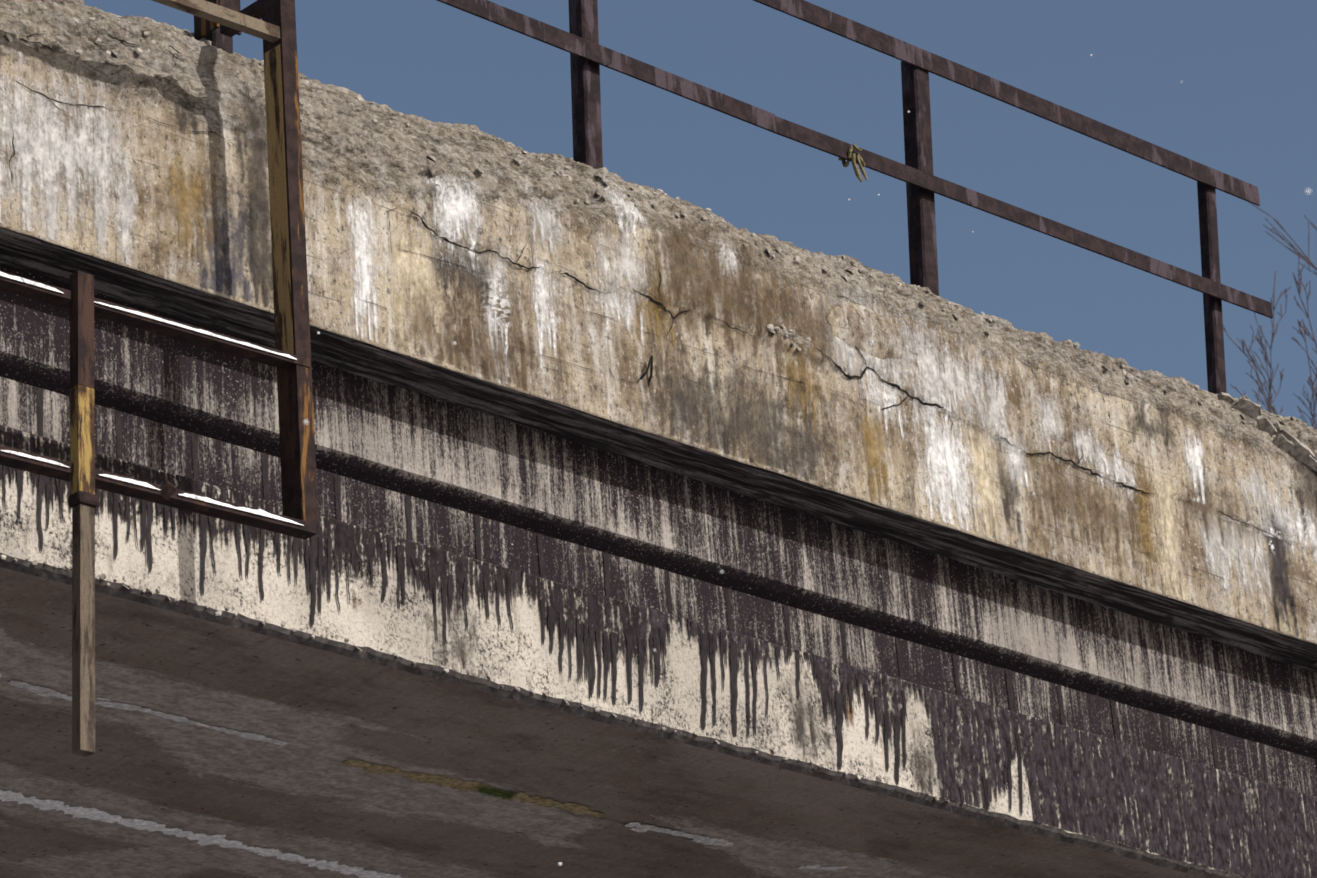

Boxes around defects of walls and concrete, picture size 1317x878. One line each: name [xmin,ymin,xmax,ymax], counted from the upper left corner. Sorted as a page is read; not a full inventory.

damp [348,176,510,384]
damp [526,176,561,368]
damp [590,186,647,345]
damp [716,240,738,270]
damp [0,425,70,462]
damp [0,465,71,552]
damp [95,452,283,515]
damp [643,354,836,486]
crack [386,196,1307,560]
damp [0,626,72,711]
damp [95,488,1317,878]